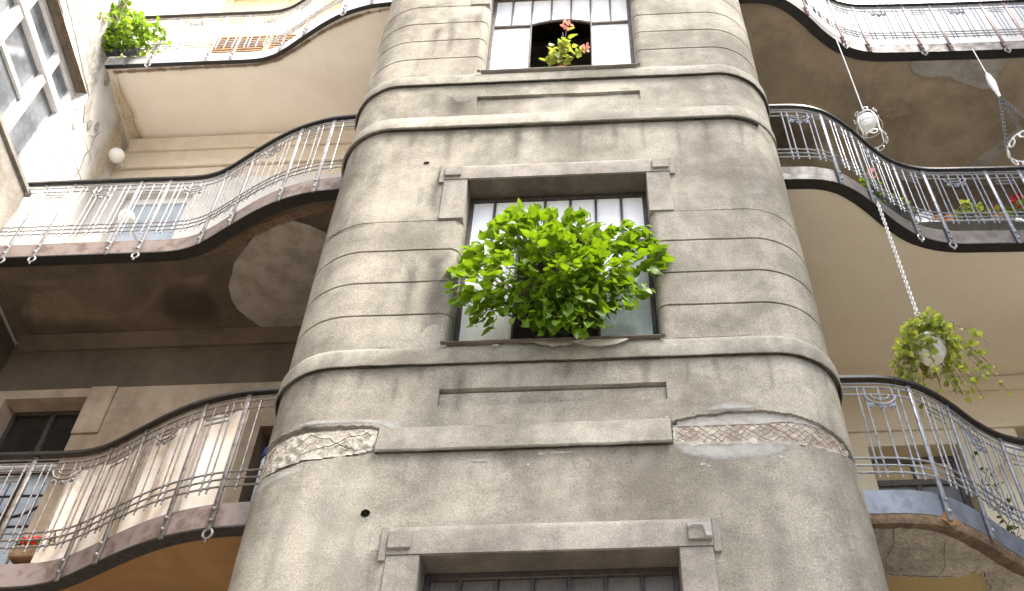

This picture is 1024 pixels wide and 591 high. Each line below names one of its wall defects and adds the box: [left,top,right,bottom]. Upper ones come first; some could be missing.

peeling [205,205,335,256]
spalling [253,420,401,498]
spalling [665,403,854,467]